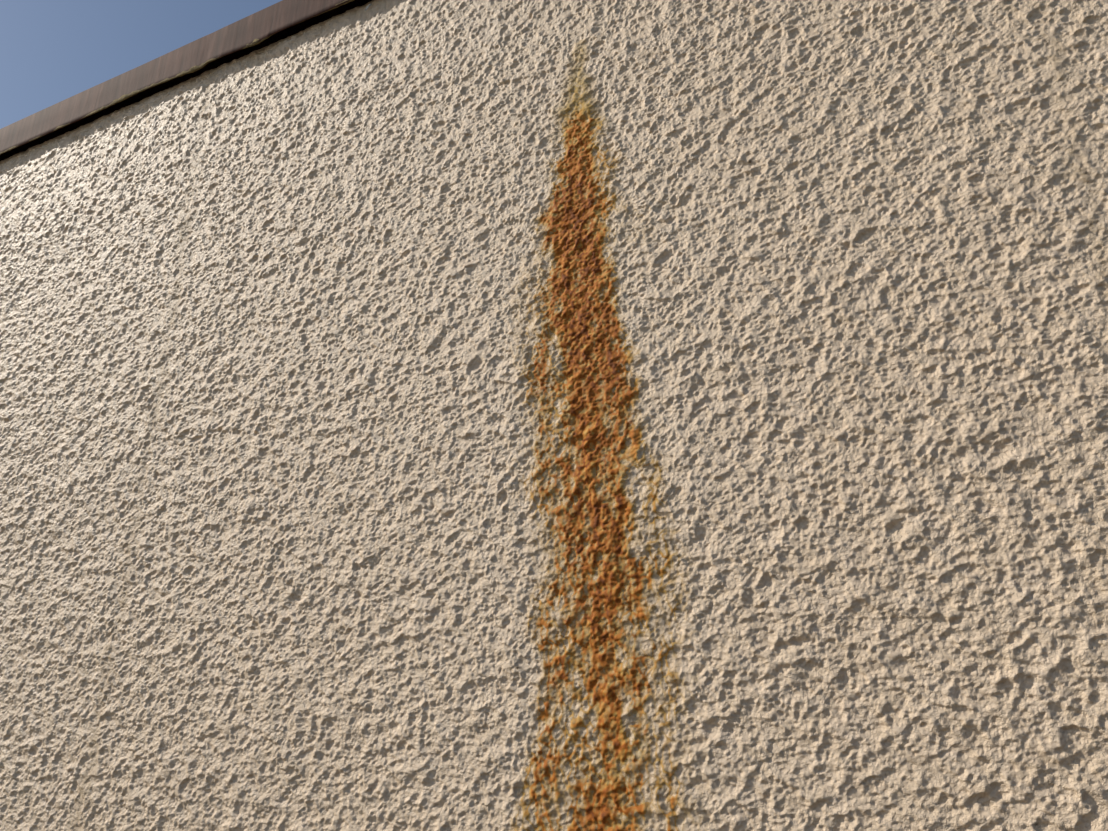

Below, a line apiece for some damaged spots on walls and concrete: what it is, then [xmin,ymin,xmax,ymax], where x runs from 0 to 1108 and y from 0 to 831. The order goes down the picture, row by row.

corrosion [515,48,681,831]